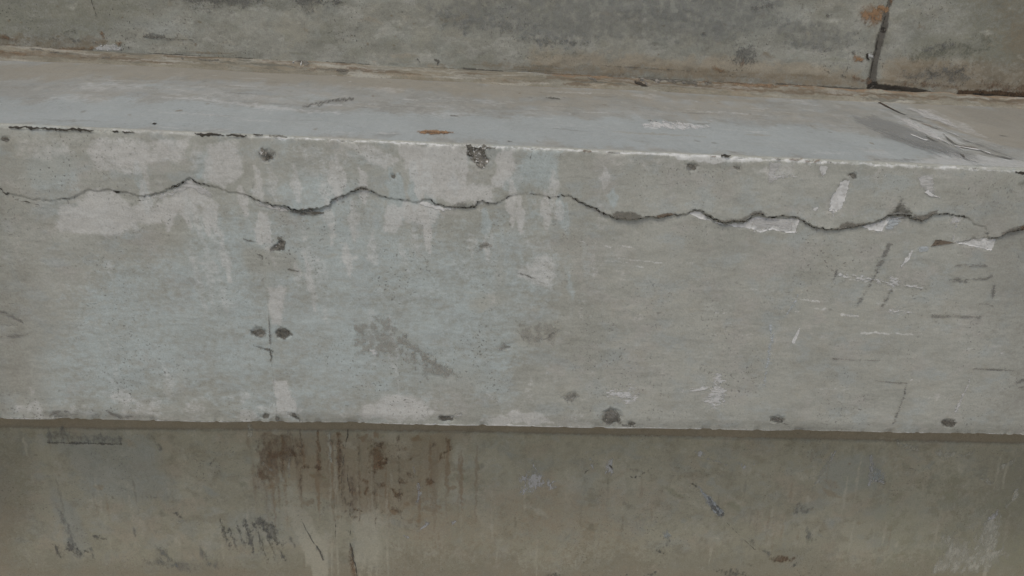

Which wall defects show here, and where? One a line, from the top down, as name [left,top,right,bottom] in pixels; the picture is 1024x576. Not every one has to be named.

crack [776,0,1012,162]
spalling [195,133,287,162]
spalling [466,144,496,168]
crack [249,187,401,216]
peeling [813,173,857,217]
crack [431,194,1024,246]
peeling [950,217,996,251]